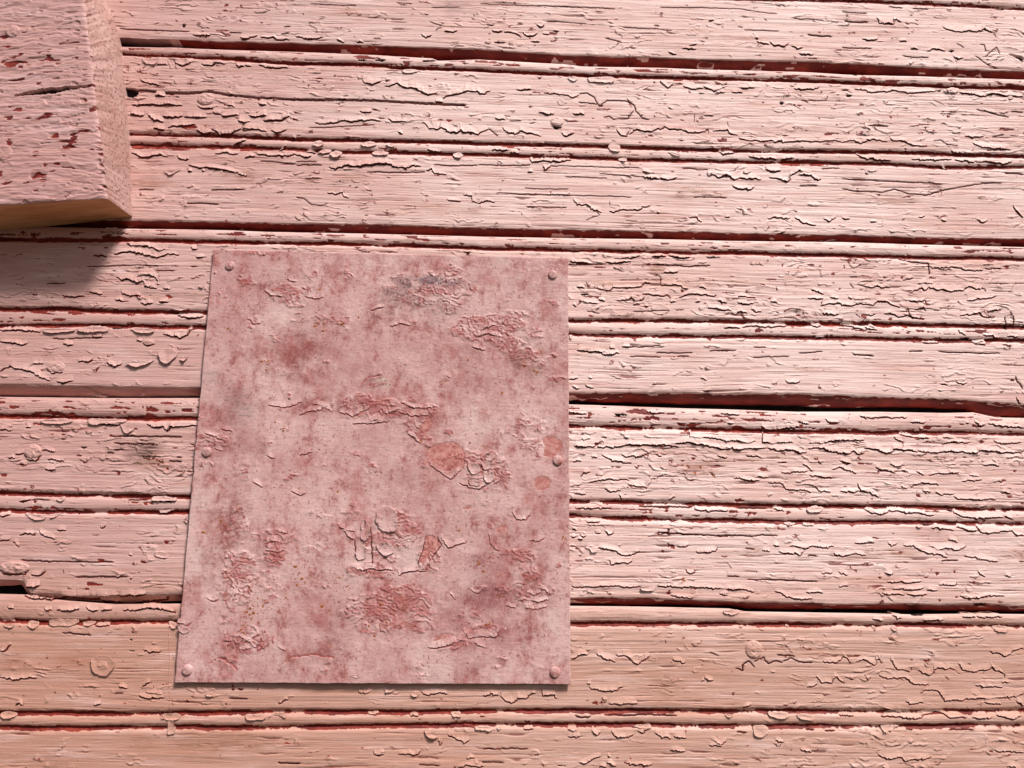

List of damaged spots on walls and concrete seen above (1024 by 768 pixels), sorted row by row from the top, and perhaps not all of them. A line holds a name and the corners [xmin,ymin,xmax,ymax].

peeling [142,56,288,68]
peeling [843,74,1024,99]
peeling [131,77,571,176]
peeling [642,152,838,189]
peeling [869,117,1024,175]
peeling [0,227,203,367]
peeling [569,253,1018,346]
peeling [543,411,1024,576]
peeling [2,578,190,636]
peeling [872,568,1010,632]
peeling [865,643,1024,733]
peeling [737,711,835,742]